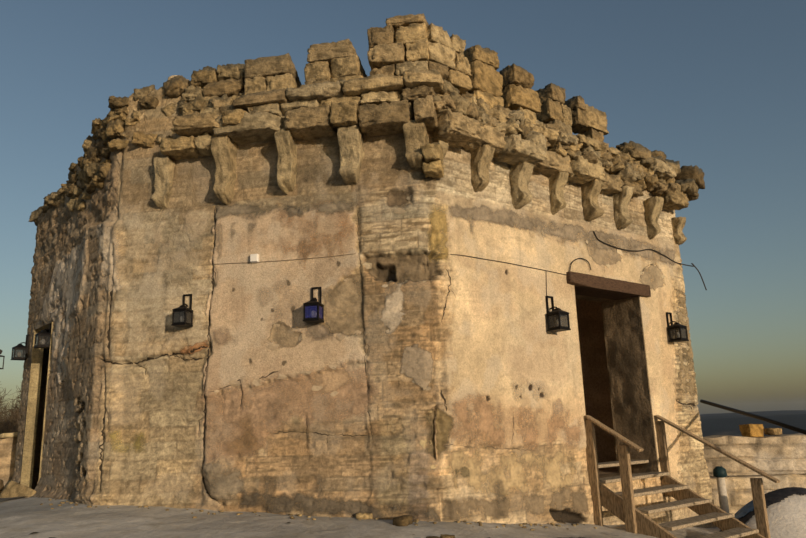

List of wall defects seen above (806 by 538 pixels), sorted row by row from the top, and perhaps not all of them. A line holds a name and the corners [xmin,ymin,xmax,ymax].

spalling [381,187,414,214]
flaking render [322,254,441,341]
crack [99,209,279,504]
crack [274,318,374,450]
damp [240,476,510,522]
spalling [496,508,597,531]
damp [522,477,588,515]